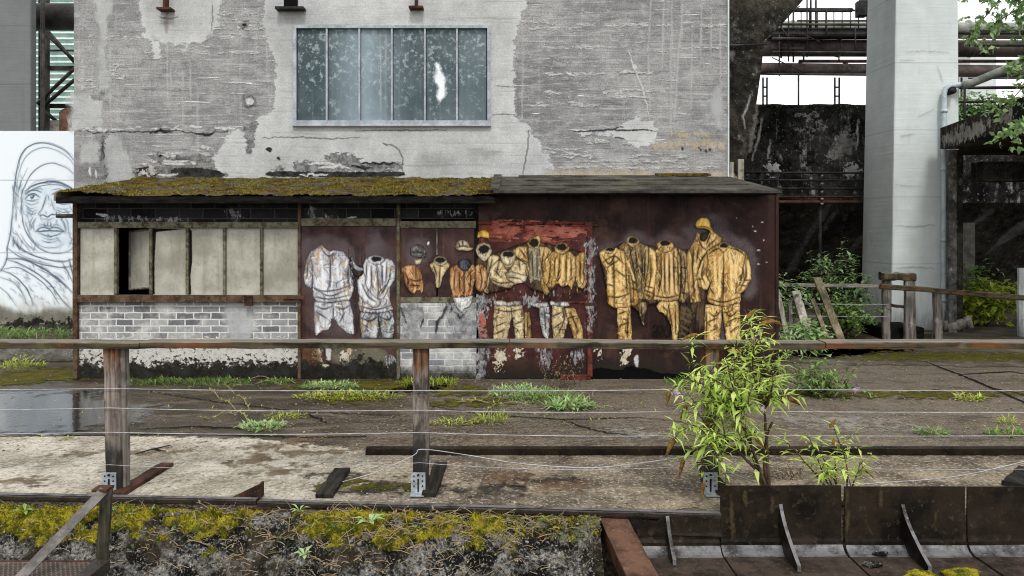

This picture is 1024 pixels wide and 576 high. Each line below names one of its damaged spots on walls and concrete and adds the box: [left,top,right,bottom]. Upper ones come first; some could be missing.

peeling [67,0,726,183]
crack [81,125,236,183]
water stain [789,111,858,164]
peeling [488,219,598,332]
water stain [79,361,104,379]
water stain [130,348,403,379]